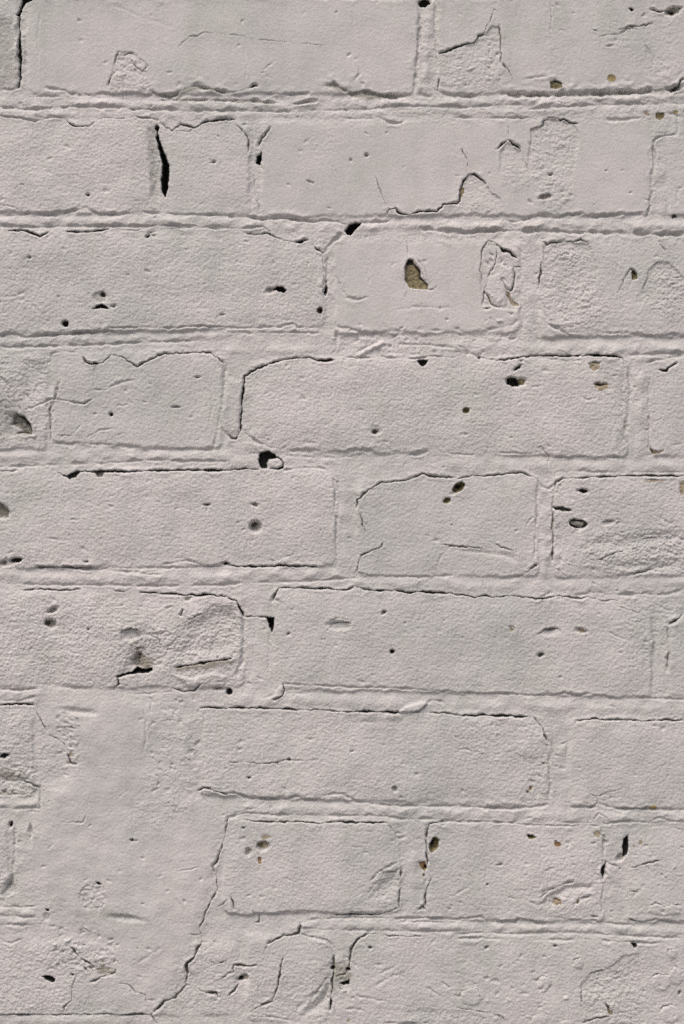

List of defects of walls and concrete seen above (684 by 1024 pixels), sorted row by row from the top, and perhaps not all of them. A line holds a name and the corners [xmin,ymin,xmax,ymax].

crack [138,117,321,252]
peeling [404,242,437,293]
peeling [479,241,522,311]
crack [240,360,282,429]
spalling [259,451,276,468]
crack [357,479,410,569]
crack [54,787,310,1024]
crack [330,913,381,1009]